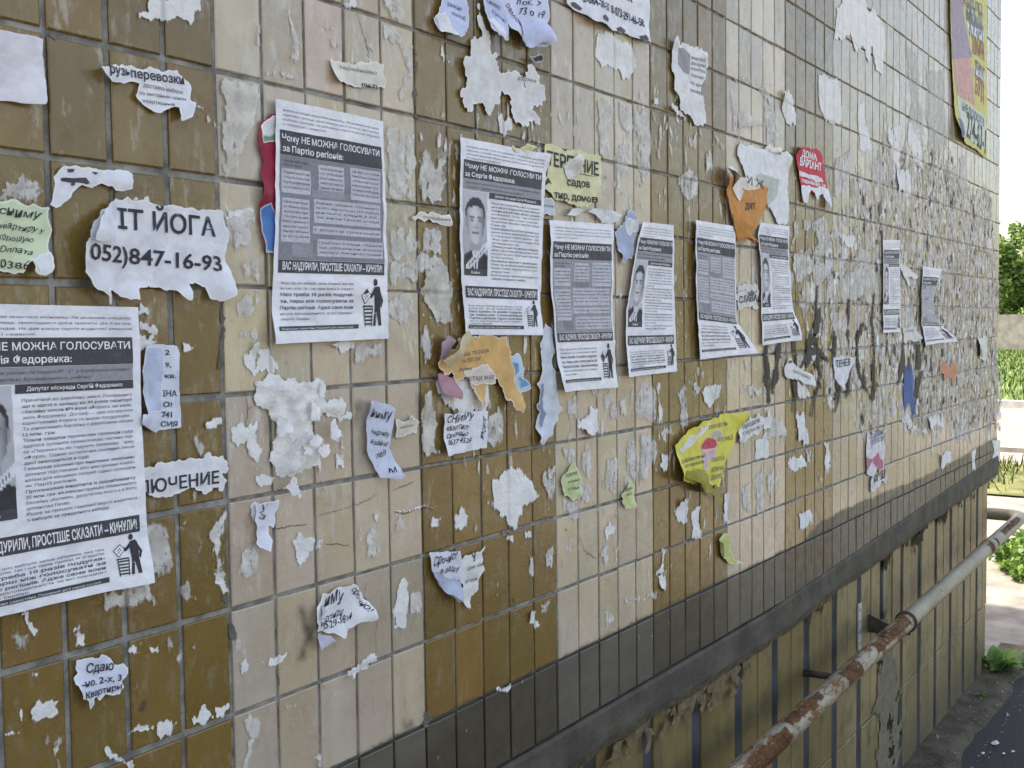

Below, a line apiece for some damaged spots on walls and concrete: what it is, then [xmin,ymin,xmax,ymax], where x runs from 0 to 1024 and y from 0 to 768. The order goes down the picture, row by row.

corrosion [987,517,1020,553]
corrosion [871,615,912,652]
corrosion [838,660,864,686]
spalling [603,659,752,768]
corrosion [747,692,824,768]